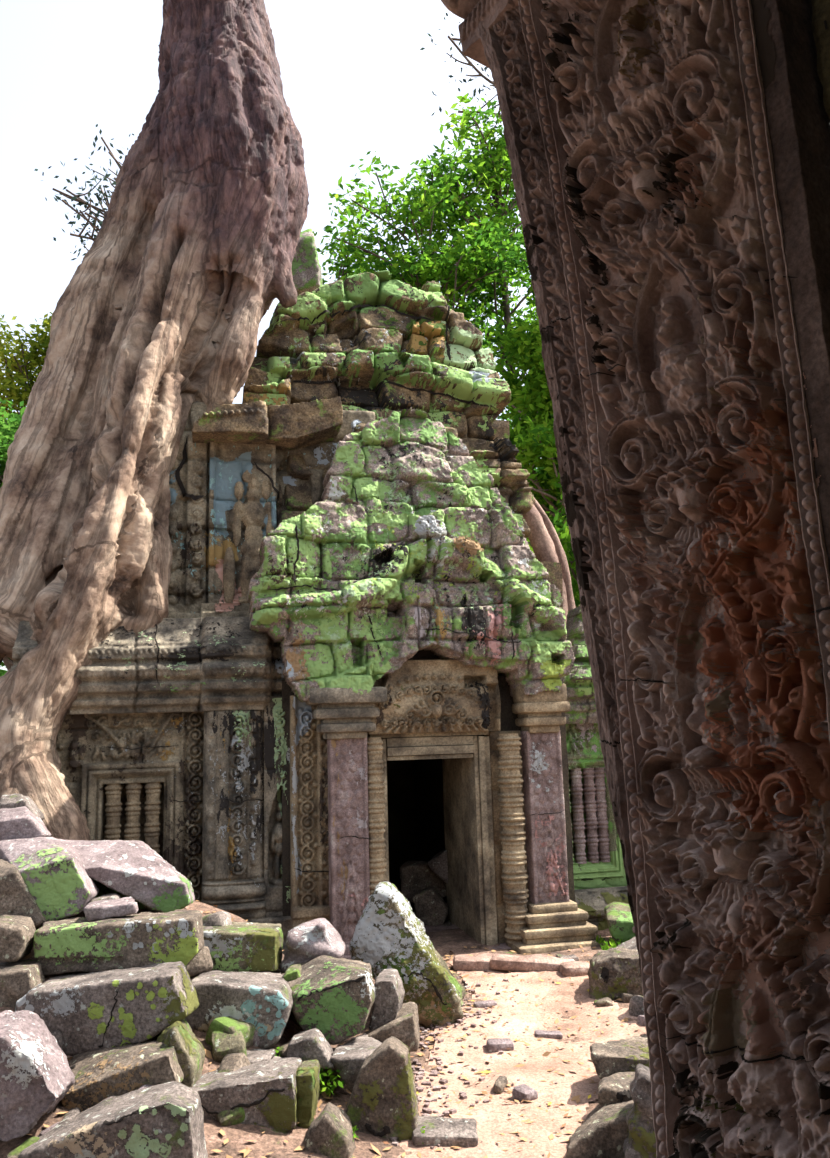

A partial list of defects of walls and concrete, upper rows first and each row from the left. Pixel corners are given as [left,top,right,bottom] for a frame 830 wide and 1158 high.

damp [522,224,545,285]
spalling [203,451,253,568]
spalling [260,496,277,537]
crack [270,522,340,590]
damp [557,427,594,611]
damp [64,705,276,881]
damp [613,802,634,914]